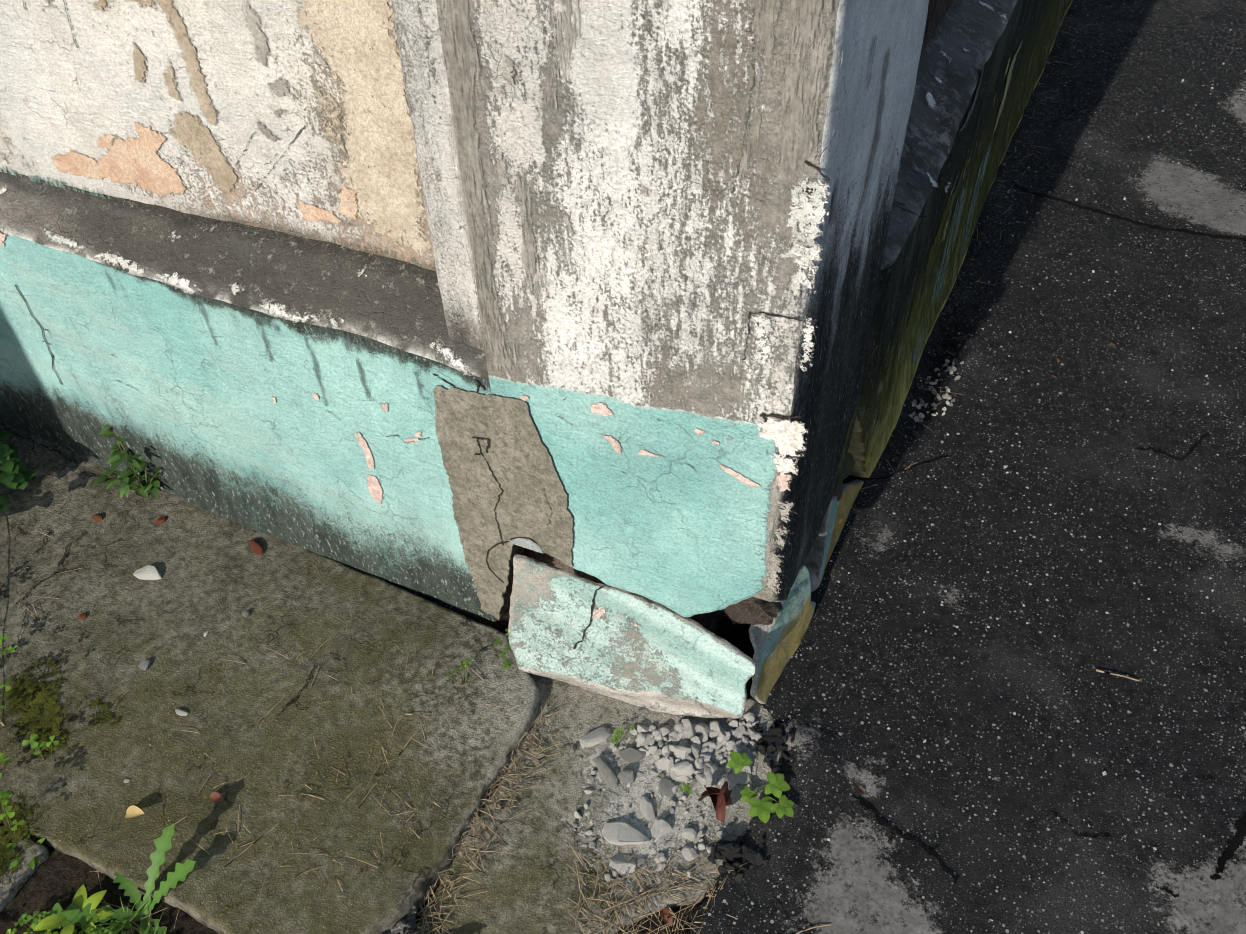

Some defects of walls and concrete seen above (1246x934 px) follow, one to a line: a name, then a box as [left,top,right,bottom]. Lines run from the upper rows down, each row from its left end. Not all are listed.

peeling [0,0,239,202]
peeling [244,0,290,142]
peeling [293,0,435,269]
leakage [993,41,1023,133]
leakage [1220,80,1246,134]
leakage [1127,153,1246,235]
flaking render [40,227,203,295]
flaking render [259,301,344,327]
flaking render [430,342,475,379]
crack [472,437,553,583]
peeling [716,461,759,488]
crack [573,586,602,649]